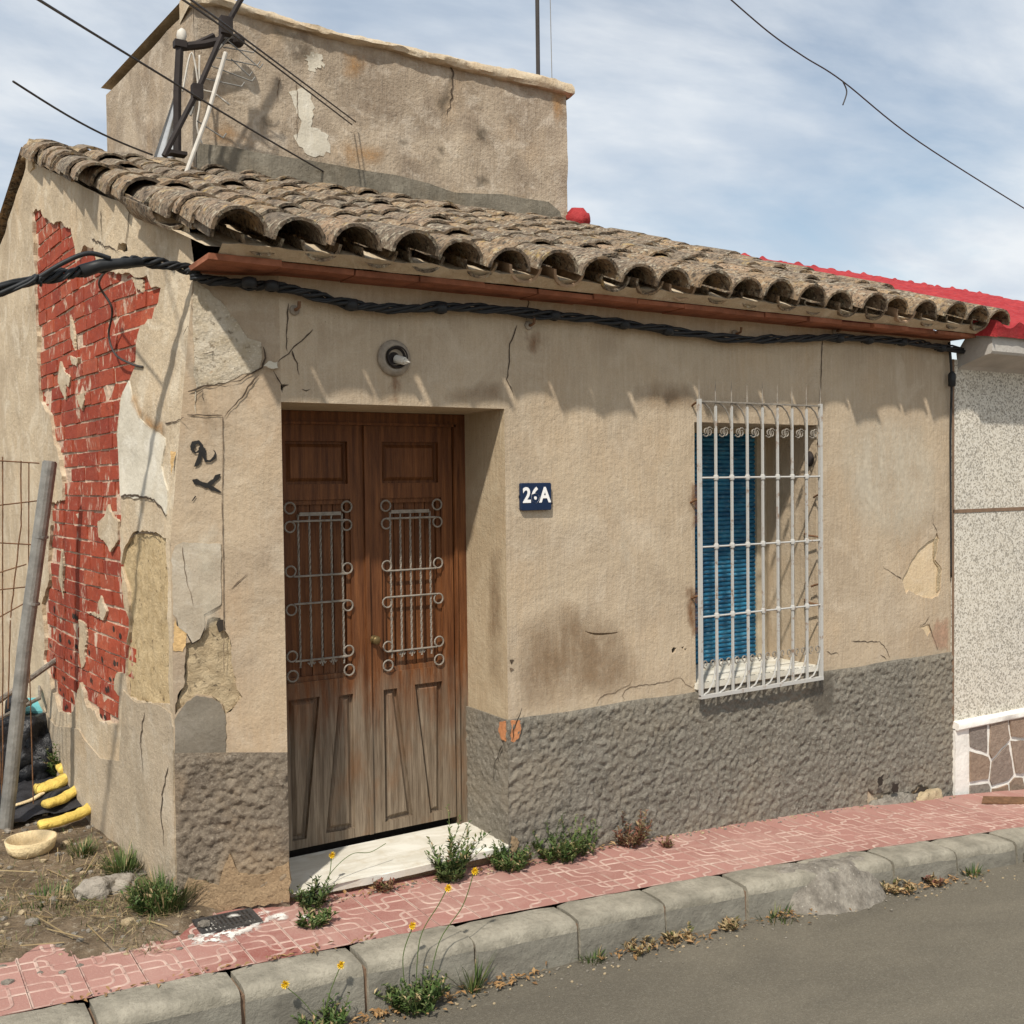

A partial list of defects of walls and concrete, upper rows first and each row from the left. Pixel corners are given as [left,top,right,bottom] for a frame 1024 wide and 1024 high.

flaking render [288,88,330,157]
flaking render [304,52,325,72]
crack [446,67,454,113]
crack [506,301,529,396]
flaking render [35,210,242,723]
crack [165,303,312,651]
spalling [886,514,942,599]
crack [596,678,695,705]
spalling [493,709,522,779]
crack [140,714,168,845]
spalling [868,774,943,806]